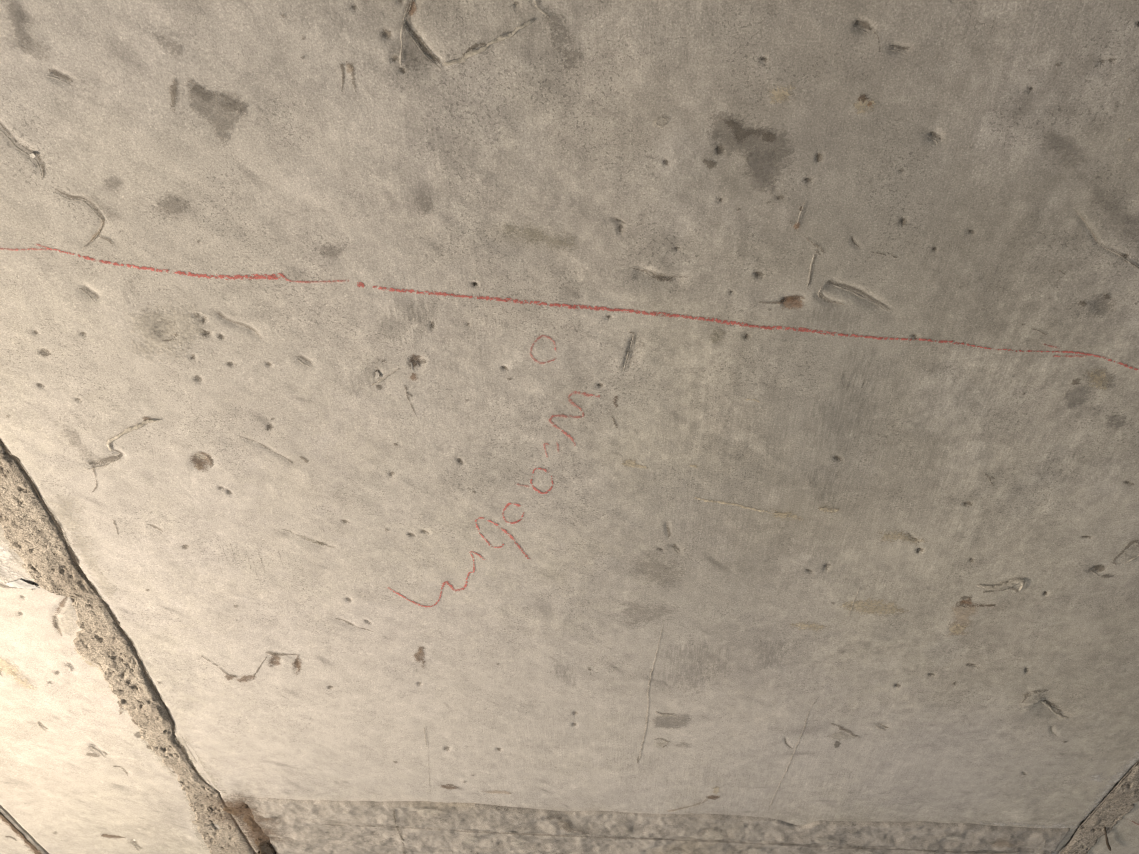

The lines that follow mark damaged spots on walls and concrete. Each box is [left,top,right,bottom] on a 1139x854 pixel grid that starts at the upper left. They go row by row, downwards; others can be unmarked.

peeling [0,545,40,590]